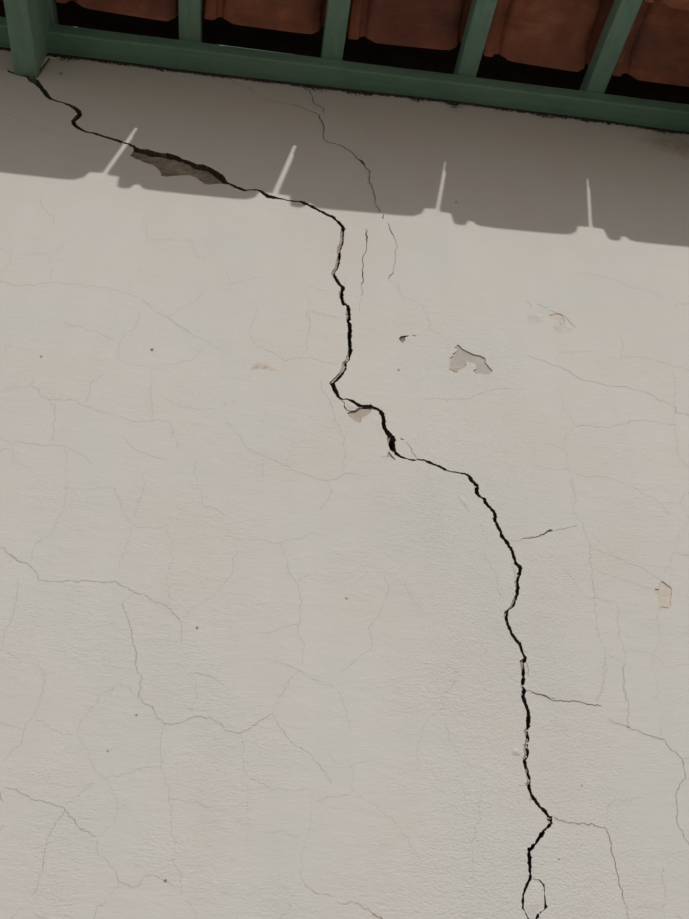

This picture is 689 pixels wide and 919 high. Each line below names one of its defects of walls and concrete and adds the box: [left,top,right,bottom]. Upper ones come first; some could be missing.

spalling [130,149,224,185]
peeling [449,345,492,375]
crack [24,58,601,919]